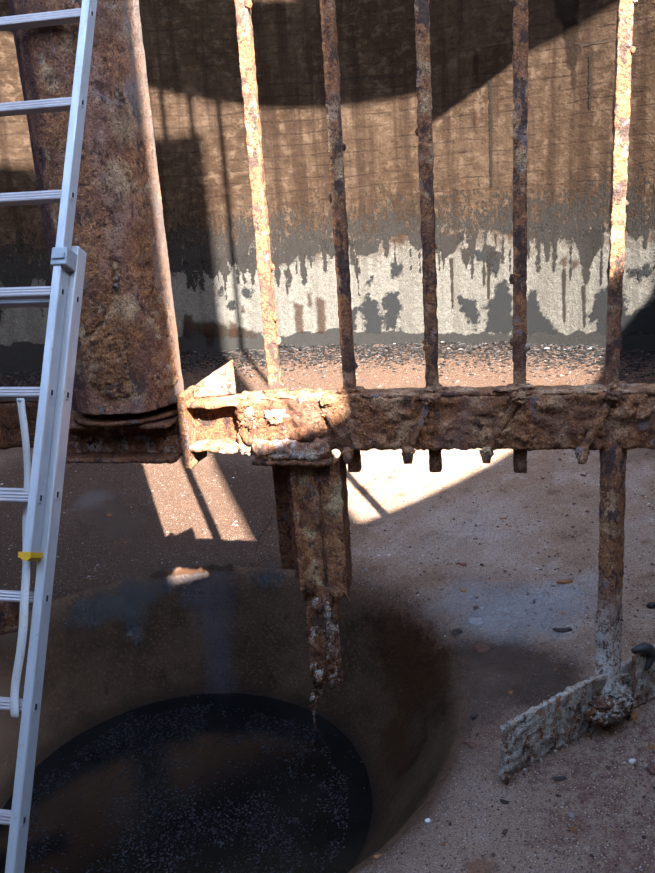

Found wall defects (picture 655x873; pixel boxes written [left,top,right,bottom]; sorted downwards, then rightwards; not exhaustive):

water stain [0,341,45,377]
water stain [0,207,52,288]
water stain [164,194,257,310]
water stain [178,321,265,355]
water stain [267,185,335,294]
water stain [278,328,340,348]
water stain [346,178,424,345]
water stain [433,80,513,344]
water stain [526,164,612,348]
water stain [621,262,655,351]
water stain [625,151,655,249]